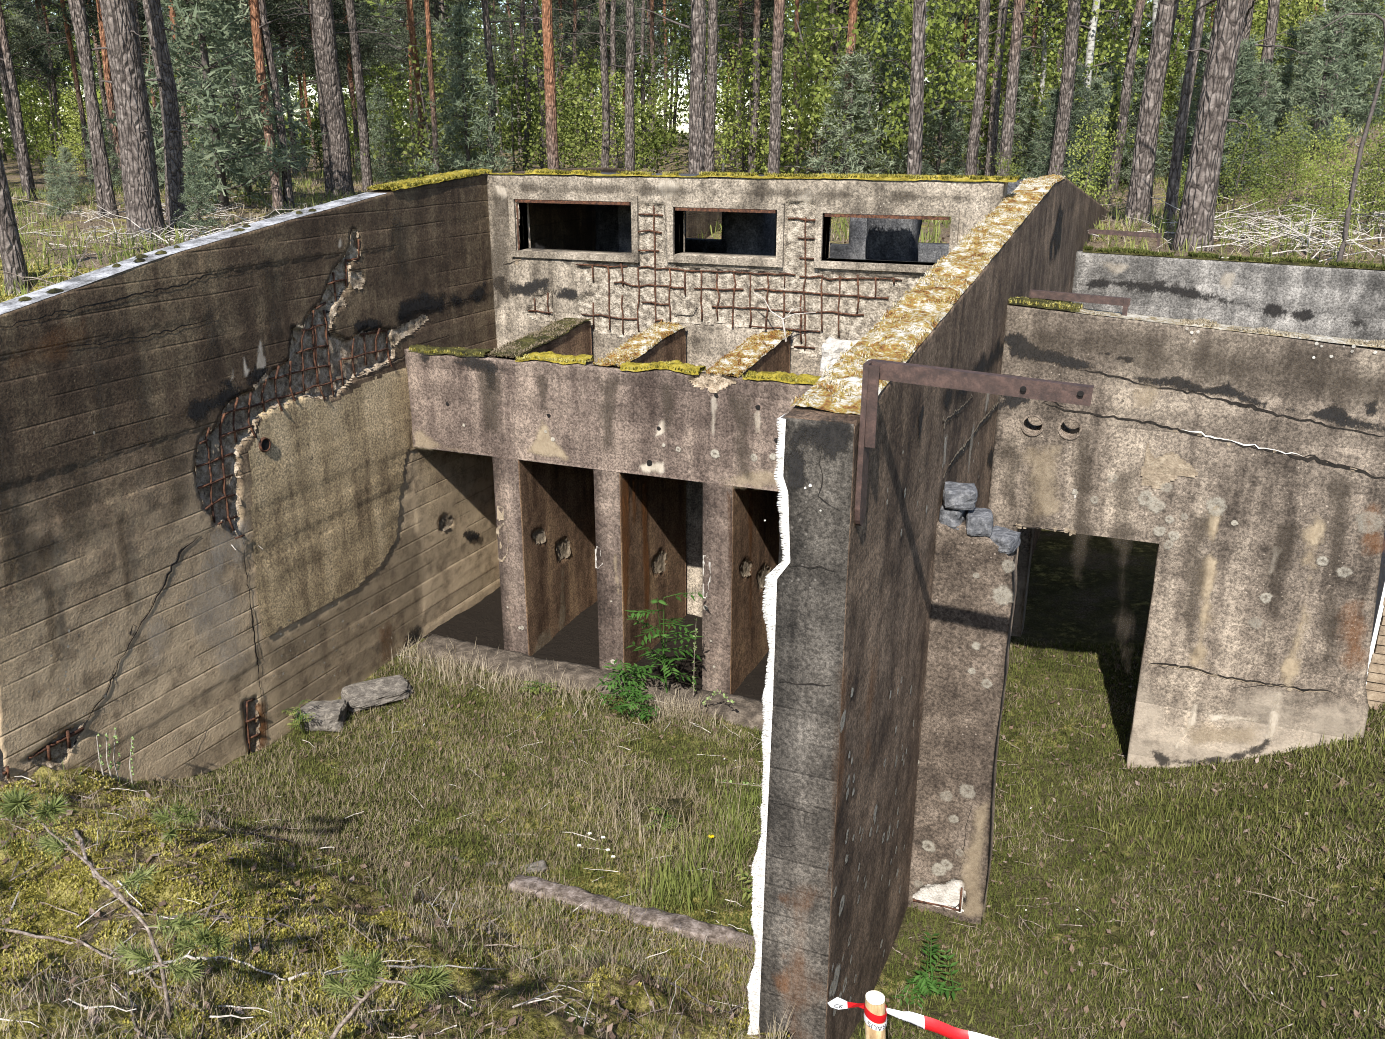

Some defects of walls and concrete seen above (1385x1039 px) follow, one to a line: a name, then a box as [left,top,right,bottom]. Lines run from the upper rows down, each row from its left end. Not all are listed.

crack [1,264,244,350]
spalling [576,201,925,357]
flaking render [194,229,429,638]
crack [1044,369,1385,479]
water stain [1365,398,1378,416]
crack [60,536,199,763]
crack [1148,661,1339,697]